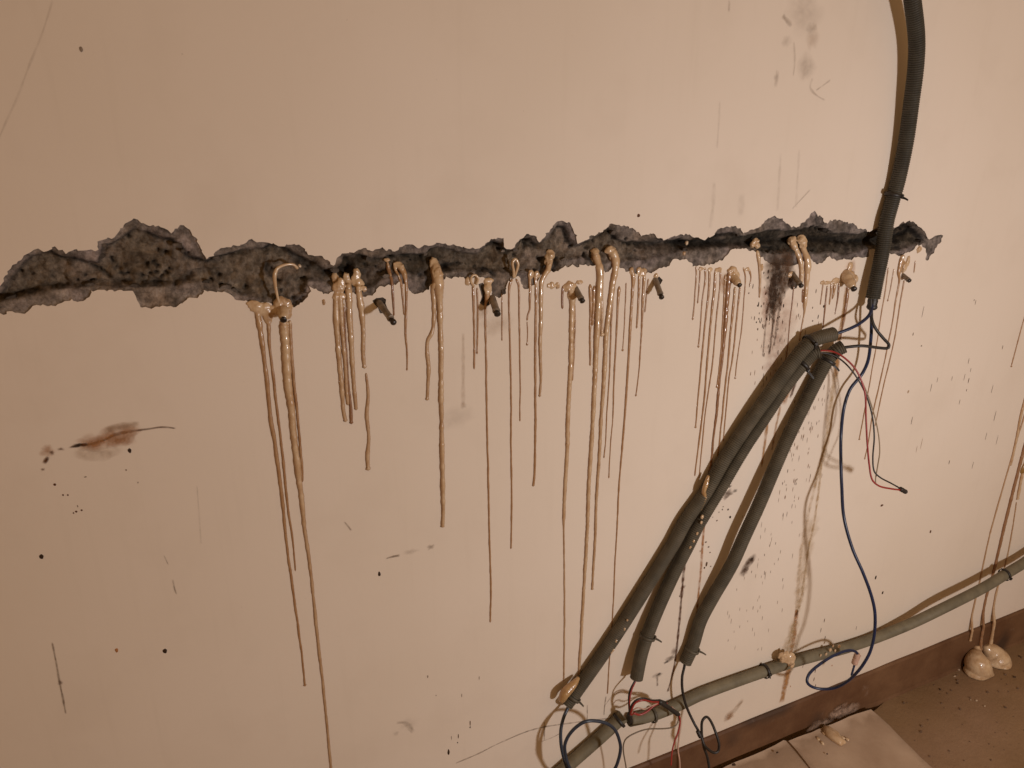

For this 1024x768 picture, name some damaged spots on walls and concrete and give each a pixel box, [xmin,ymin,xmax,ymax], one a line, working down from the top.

spalling [0,211,879,315]
spalling [890,221,943,261]
damp [692,235,858,478]
corrosion [42,427,174,470]